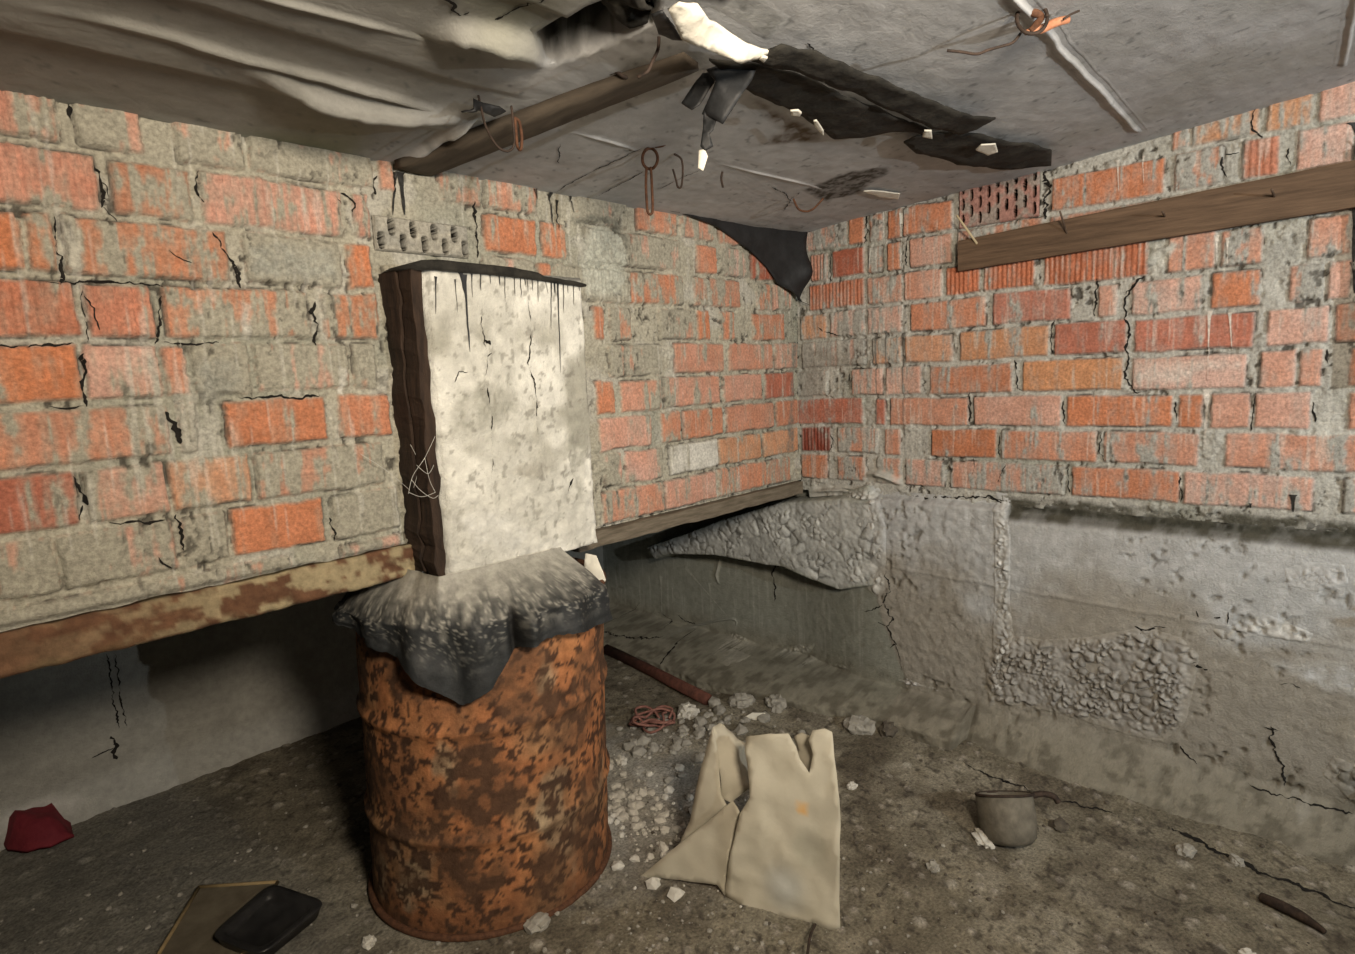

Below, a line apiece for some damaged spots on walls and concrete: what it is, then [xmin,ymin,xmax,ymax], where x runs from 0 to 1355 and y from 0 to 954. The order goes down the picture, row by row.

flaking render [668,1,769,64]
flaking render [790,109,824,136]
flaking render [976,143,998,155]
crack [194,172,241,288]
crack [0,217,219,410]
crack [165,412,182,444]
crack [238,393,320,401]
crack [73,476,184,568]
spalling [983,492,1199,743]
crack [1248,727,1353,814]
spalling [1322,755,1355,801]
crack [1167,825,1355,908]